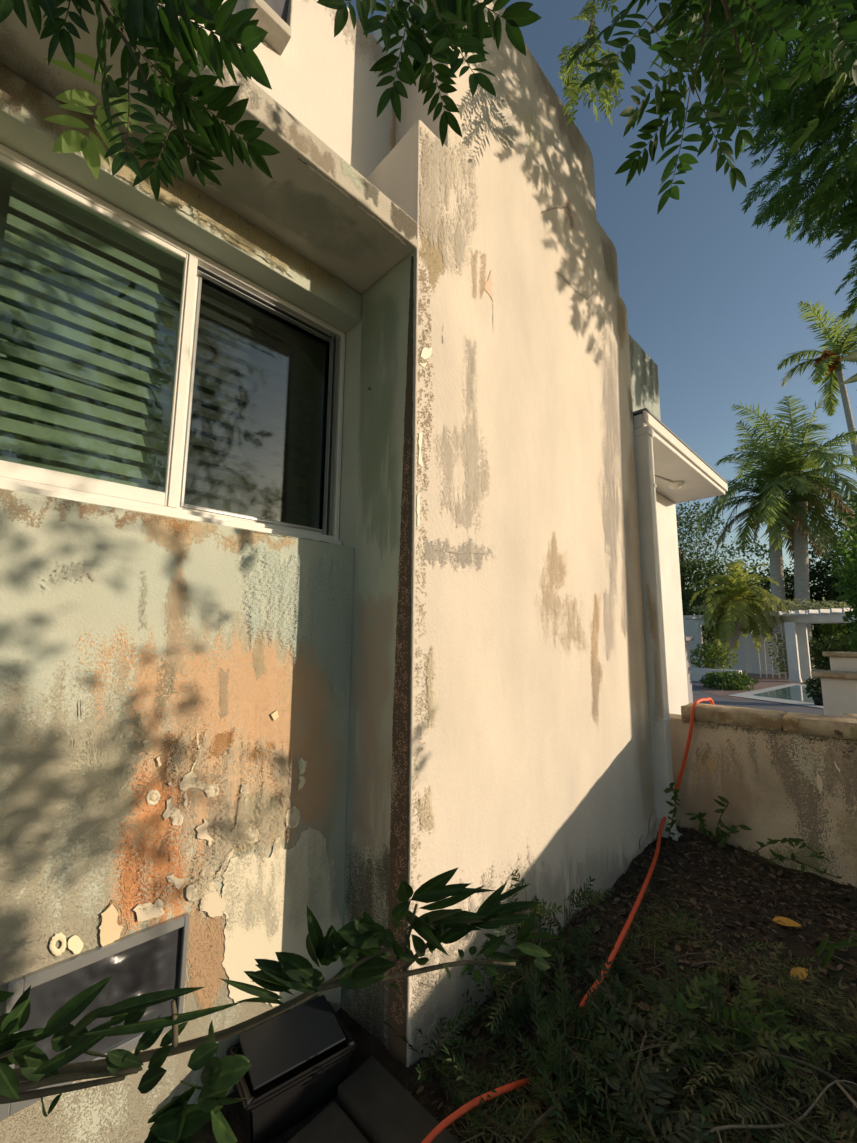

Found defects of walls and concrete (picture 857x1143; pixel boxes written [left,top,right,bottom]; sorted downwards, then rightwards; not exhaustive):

leakage [78,133,451,1065]
peeling [146,772,220,846]
leakage [676,720,857,888]
peeling [50,933,84,956]
peeling [99,903,123,946]
peeling [133,898,165,921]
peeling [166,758,343,1010]